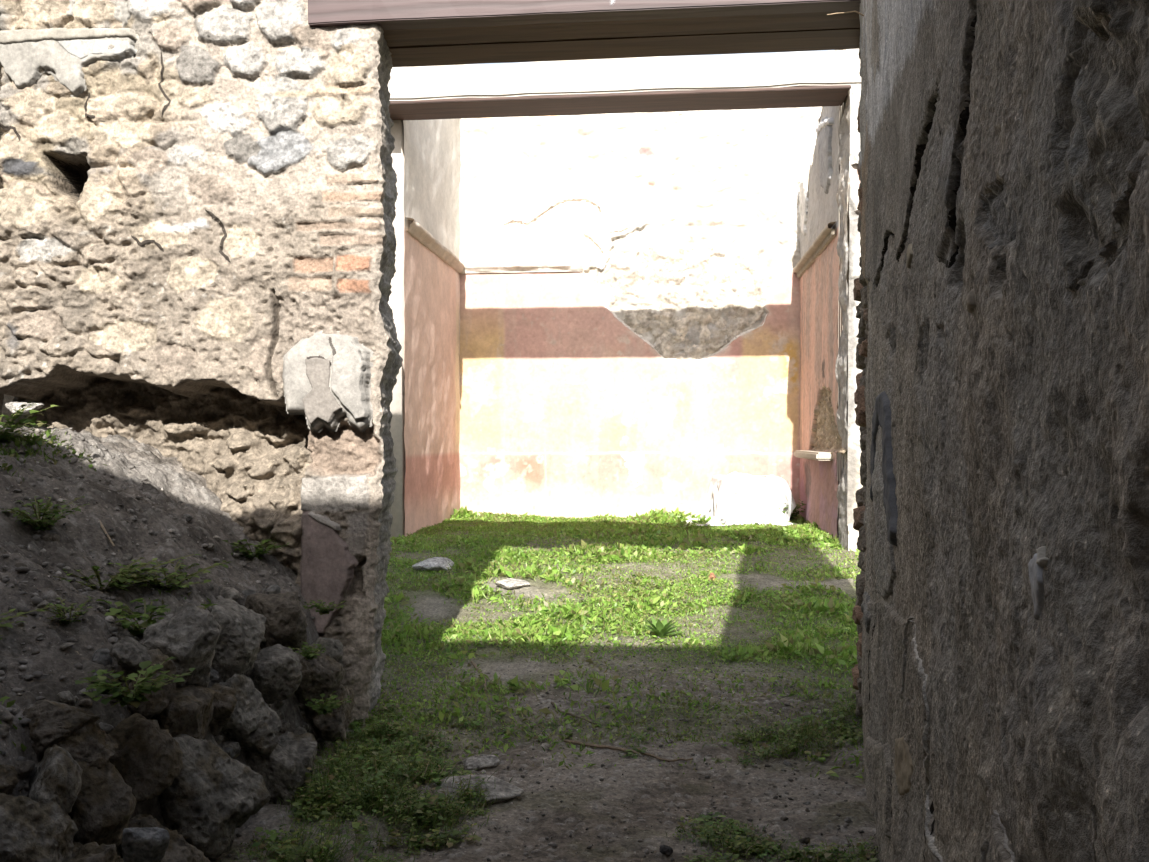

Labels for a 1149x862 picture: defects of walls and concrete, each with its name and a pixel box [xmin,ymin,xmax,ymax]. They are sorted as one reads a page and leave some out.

peeling [0,0,139,97]
crack [969,8,977,39]
flaking render [502,198,603,226]
crack [876,69,971,287]
flaking render [570,233,778,365]
crack [900,617,943,862]
crack [980,810,1015,862]
crack [1090,805,1098,862]